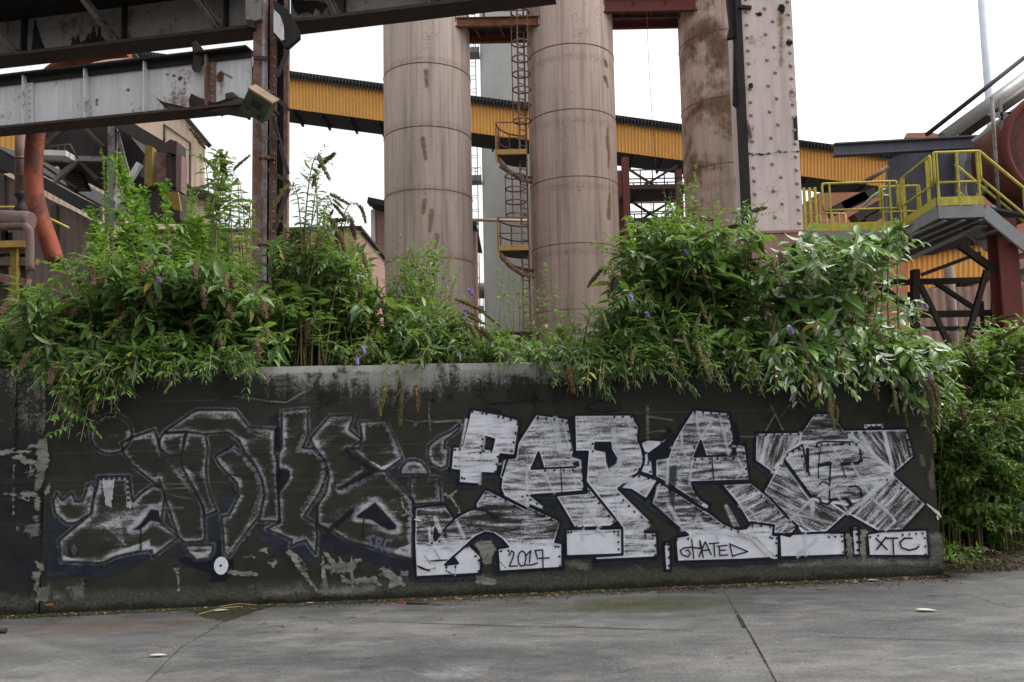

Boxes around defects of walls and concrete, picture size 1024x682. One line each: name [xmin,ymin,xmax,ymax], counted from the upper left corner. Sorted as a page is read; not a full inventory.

rust [684,20,729,72]
rust [422,199,439,249]
leakage [307,366,358,421]
peeling [0,438,50,536]
peeling [31,560,84,604]
peeling [245,547,408,598]